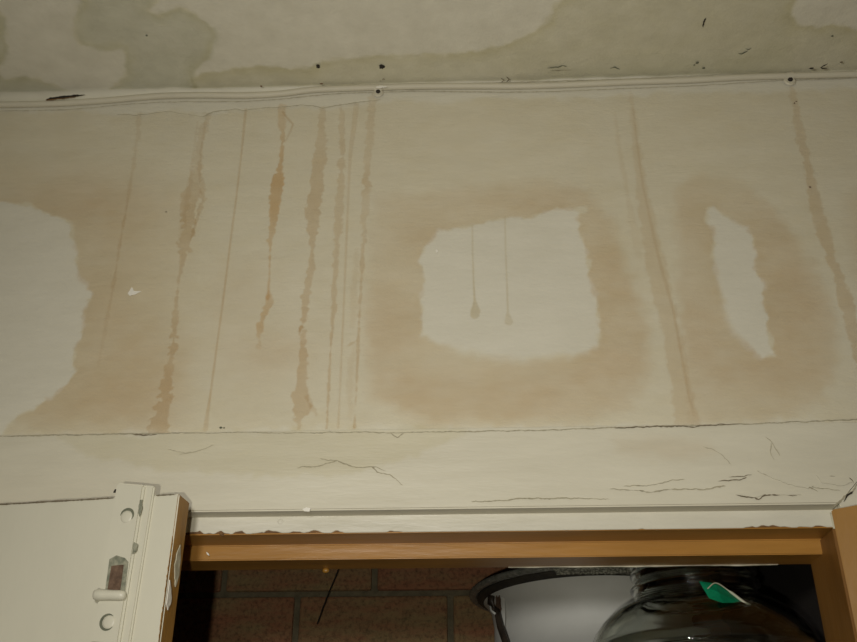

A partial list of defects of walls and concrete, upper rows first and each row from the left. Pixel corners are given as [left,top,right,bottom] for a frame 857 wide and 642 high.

crack [4,419,857,507]